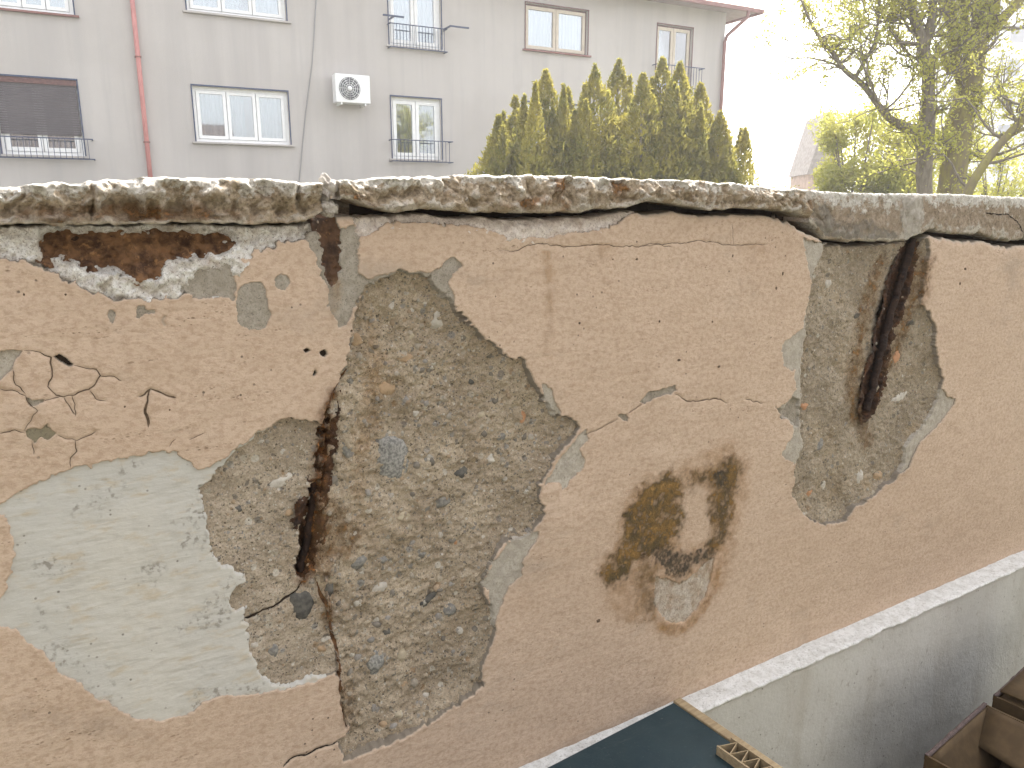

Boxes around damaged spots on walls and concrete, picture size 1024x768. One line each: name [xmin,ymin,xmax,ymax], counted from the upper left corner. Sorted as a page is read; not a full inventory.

crack [307,202,791,286]
crack [819,237,860,245]
crack [0,350,176,468]
crack [676,394,762,404]
spalling [777,238,954,523]
corrosion [845,237,932,446]
crack [242,369,347,767]
spalling [0,211,634,757]
corrosion [296,482,358,575]